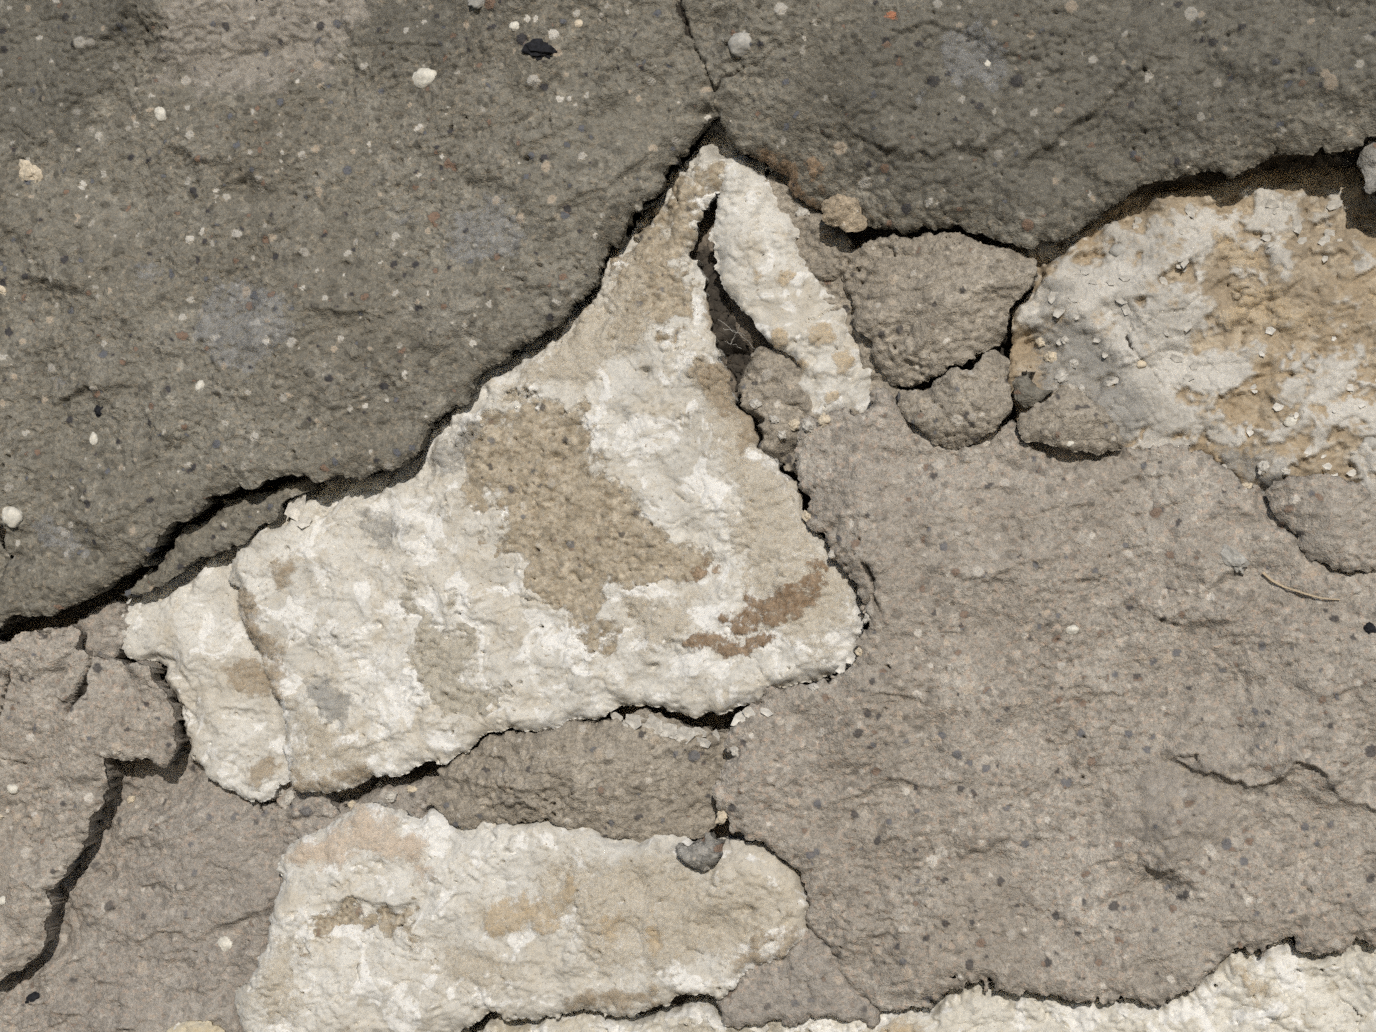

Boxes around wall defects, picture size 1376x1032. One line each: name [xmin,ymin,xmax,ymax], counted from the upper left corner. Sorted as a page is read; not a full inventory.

spalling [609,161,726,345]
crack [693,244,826,538]
crack [898,327,1013,391]
spalling [451,390,714,656]
crack [70,667,90,708]
spalling [399,582,514,728]
crack [340,706,623,809]
peeling [610,707,773,748]
crack [724,705,749,729]
spalling [0,720,341,1032]
spalling [312,897,420,950]
crack [639,994,688,1015]